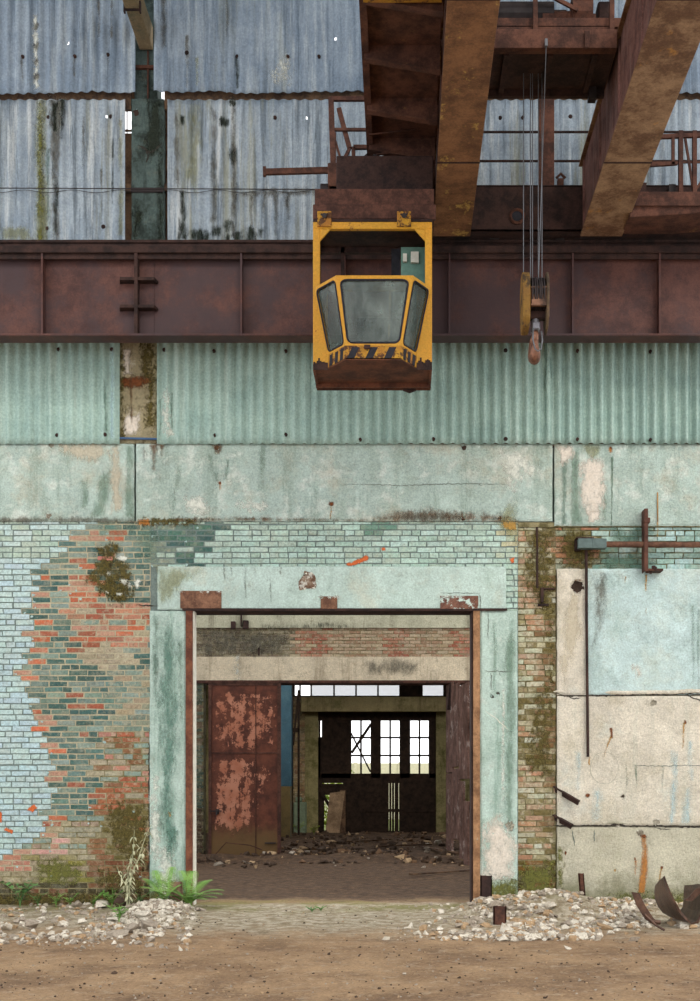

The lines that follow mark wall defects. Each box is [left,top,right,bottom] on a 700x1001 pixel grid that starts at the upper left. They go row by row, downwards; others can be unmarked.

leakage [37,99,64,240]
leakage [178,136,308,240]
peeling [558,446,573,464]
leakage [379,510,508,522]
peeling [579,458,607,522]
spalling [298,571,336,599]
peeling [0,443,231,896]
corrosion [634,835,648,893]